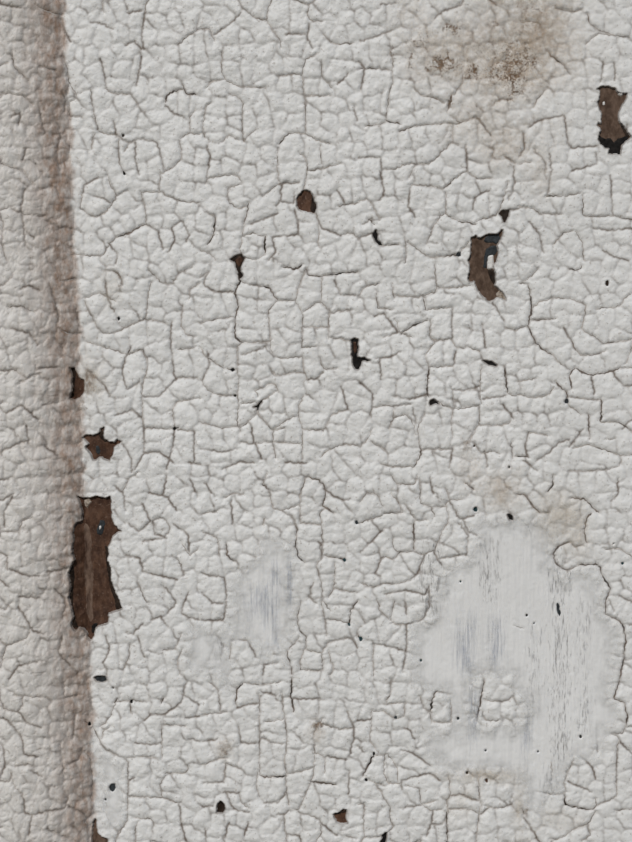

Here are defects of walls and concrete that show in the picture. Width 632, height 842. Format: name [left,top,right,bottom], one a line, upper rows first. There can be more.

crack [242,0,281,46]
crack [294,0,352,45]
crack [555,8,629,45]
peeling [598,87,630,154]
peeling [297,190,316,213]
peeling [468,210,509,301]
crack [45,21,632,560]
peeling [351,338,370,369]
peeling [84,428,121,460]
peeling [69,496,122,639]
crack [85,476,524,842]
crack [552,497,632,754]